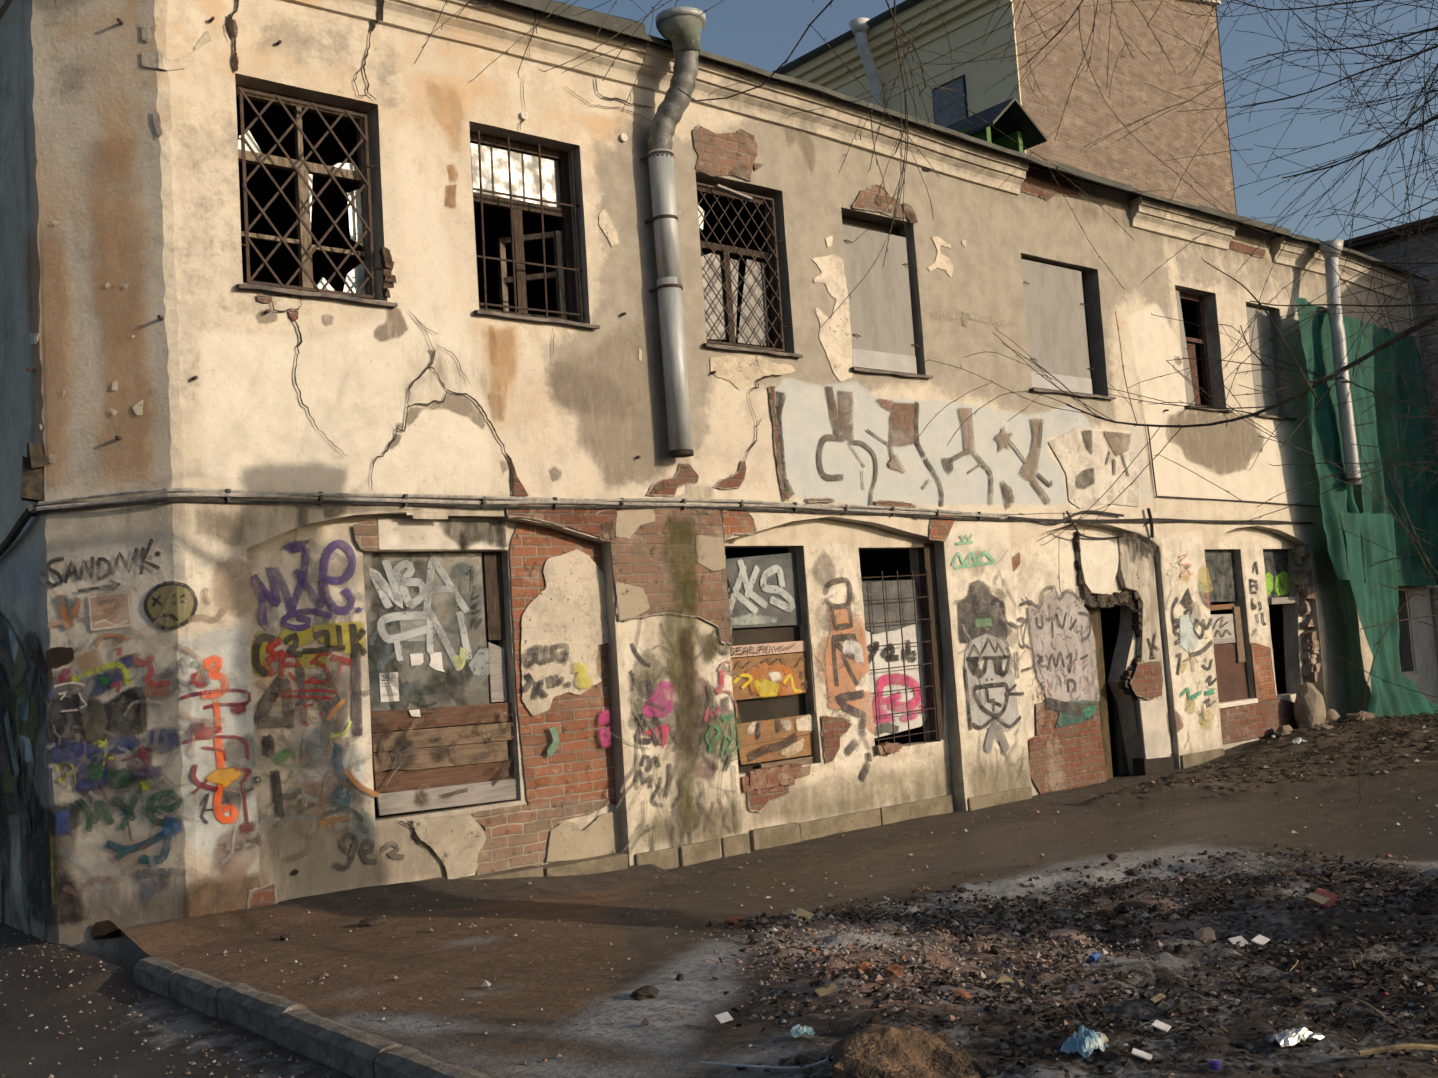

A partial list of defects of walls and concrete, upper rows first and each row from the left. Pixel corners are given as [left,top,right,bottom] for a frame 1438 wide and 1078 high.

crack [225,0,239,71]
crack [354,0,385,100]
spalling [693,124,763,182]
spalling [852,184,918,223]
peeling [928,236,966,277]
peeling [812,236,853,381]
crack [257,294,529,496]
peeling [506,460,757,716]
leakage [683,633,719,726]